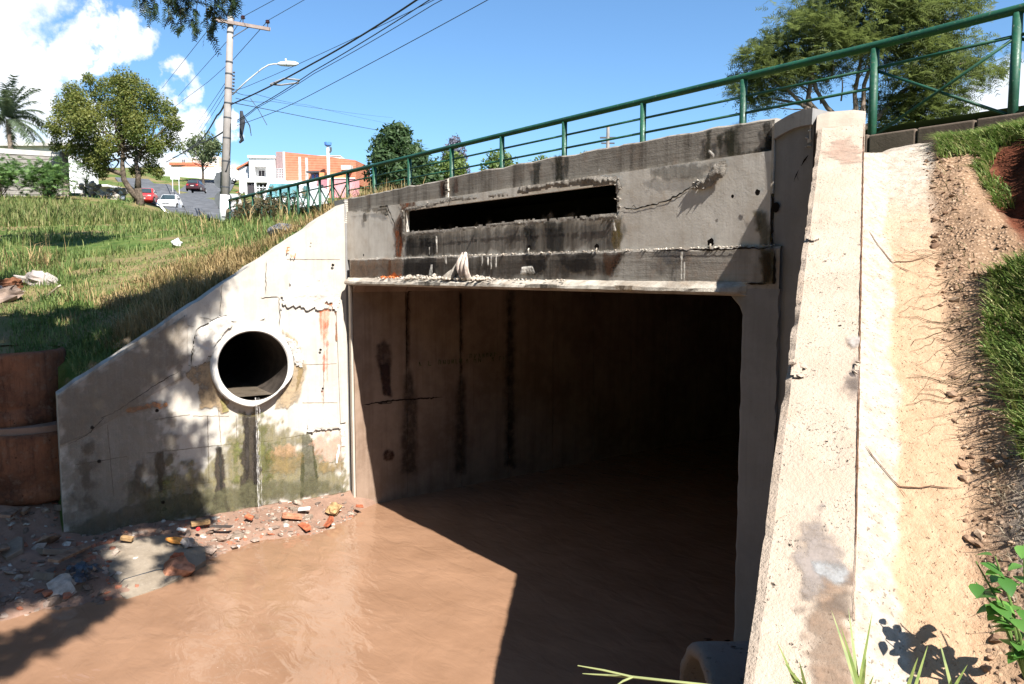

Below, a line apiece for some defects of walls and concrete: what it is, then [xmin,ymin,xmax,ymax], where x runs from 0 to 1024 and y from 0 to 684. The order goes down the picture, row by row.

spalling [404,175,622,237]
crack [623,186,693,210]
spalling [193,316,233,366]
leakage [377,342,391,396]
leakage [384,214,625,472]
leakage [57,322,345,536]
crack [364,397,439,405]
leakage [795,524,855,684]